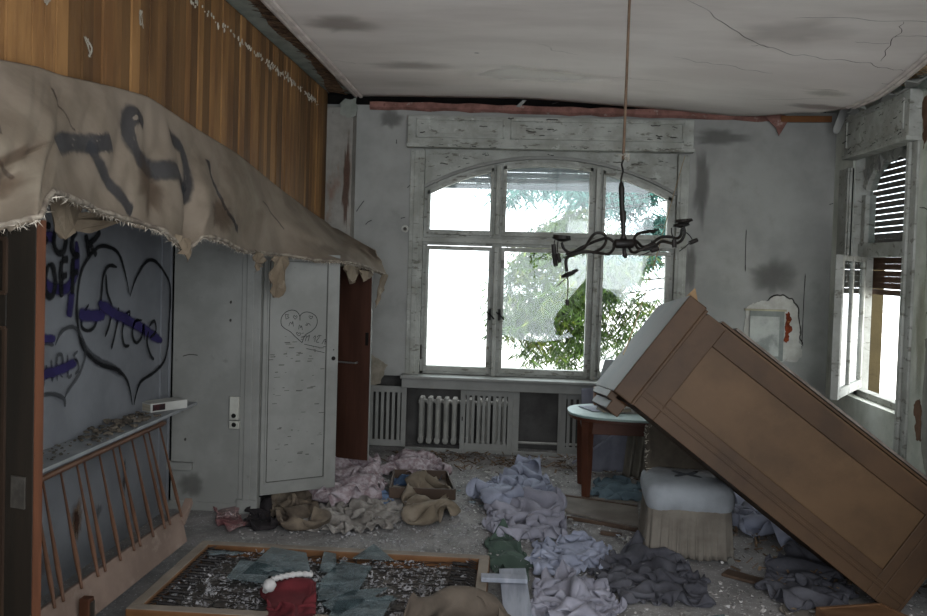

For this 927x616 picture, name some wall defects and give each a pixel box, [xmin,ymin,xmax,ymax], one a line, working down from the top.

crack [688,0,927,71]
flaking render [744,294,803,362]
flaking render [913,399,922,442]